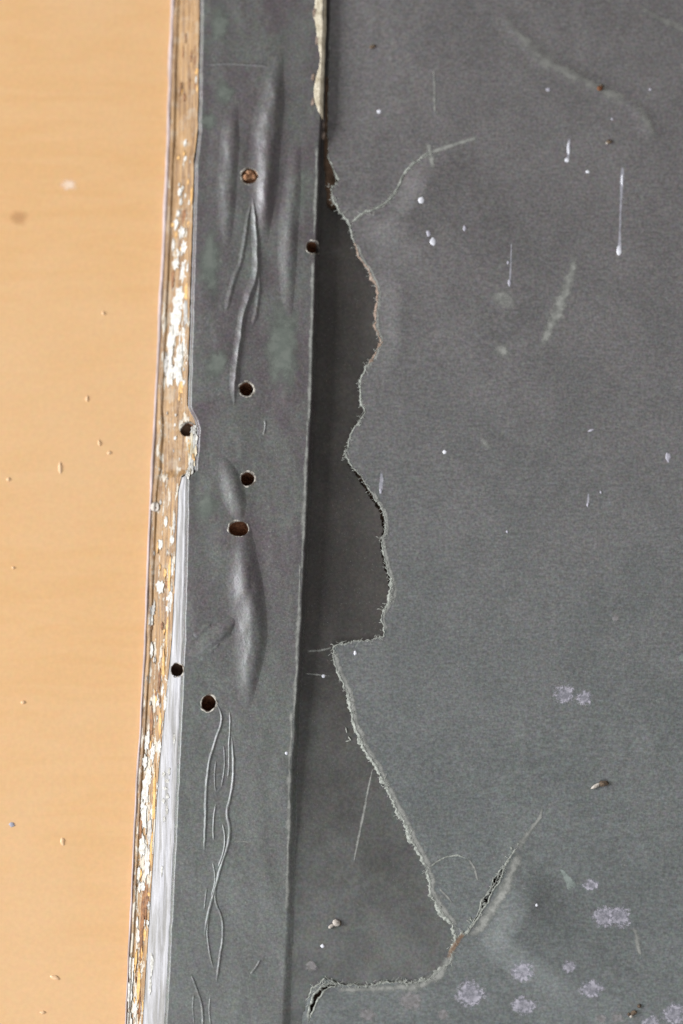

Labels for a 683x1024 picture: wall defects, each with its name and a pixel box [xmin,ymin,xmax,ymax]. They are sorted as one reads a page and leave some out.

peeling [164,180,193,401]
peeling [166,411,198,479]
leakage [553,685,591,705]
peeling [127,516,176,1024]
crack [432,810,542,939]
leakage [593,907,631,927]
leakage [512,964,534,983]
leakage [455,981,485,1006]
leakage [578,980,603,997]
leakage [512,996,536,1012]
leakage [642,1004,683,1024]